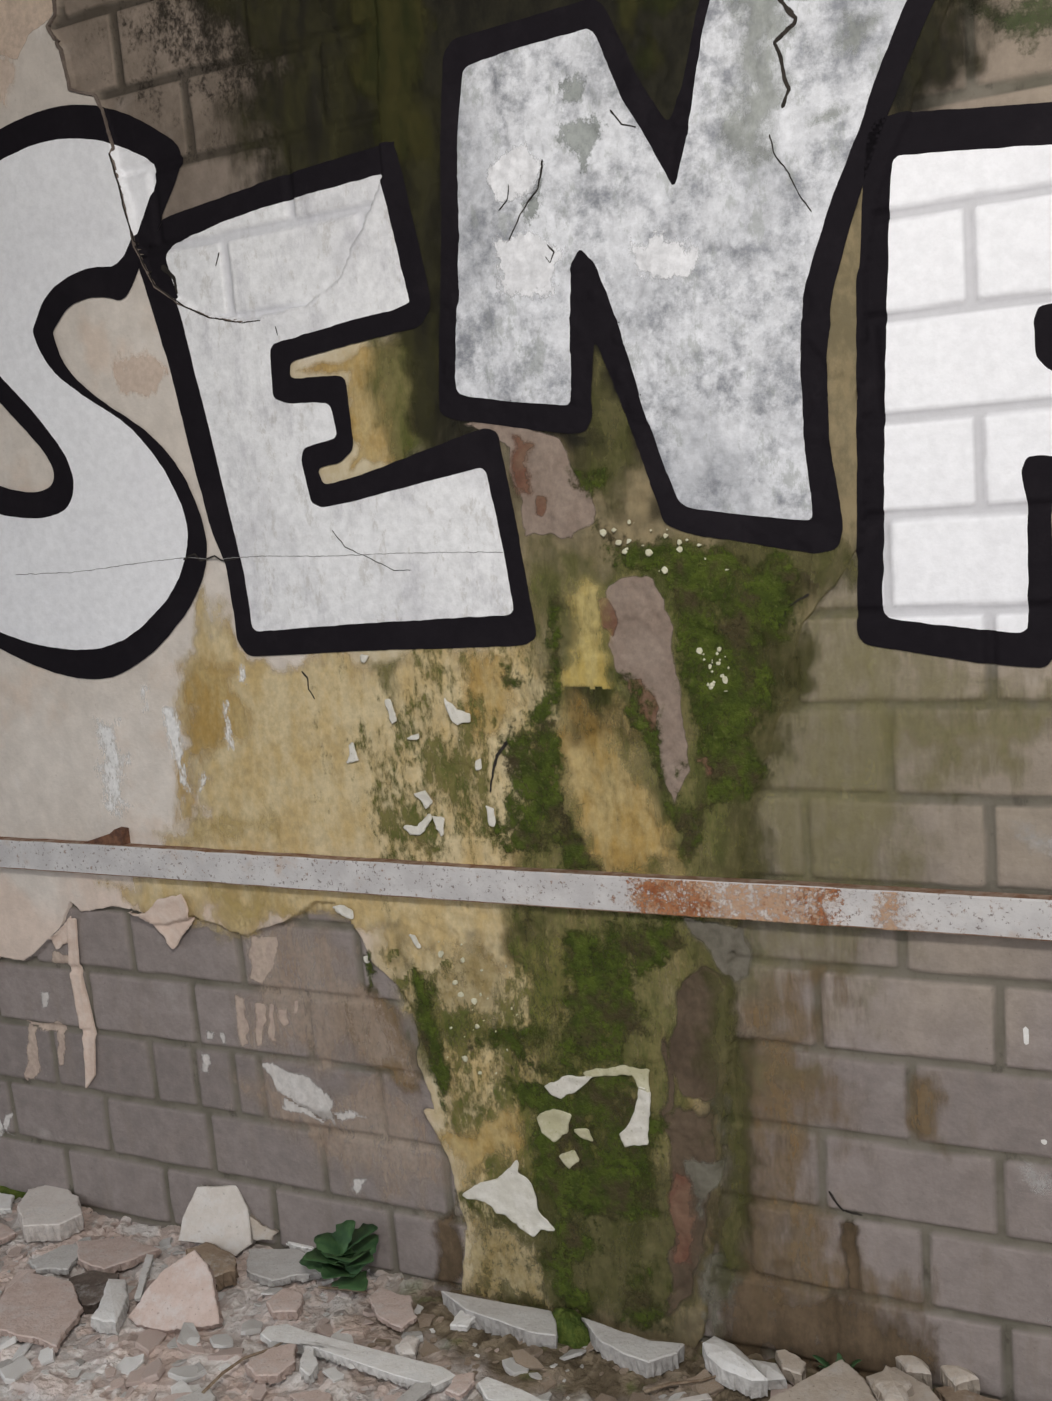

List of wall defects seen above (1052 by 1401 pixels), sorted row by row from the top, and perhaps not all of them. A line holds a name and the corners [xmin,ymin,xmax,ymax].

spalling [0,0,285,323]
crack [108,153,278,335]
damp [123,0,699,468]
crack [769,0,812,212]
damp [141,582,669,872]
peeling [598,576,725,801]
corrosion [612,878,850,926]
corrosion [873,892,910,930]
spalling [0,894,555,1401]
damp [107,877,676,1329]
peeling [537,966,719,1316]
damp [686,969,941,1380]